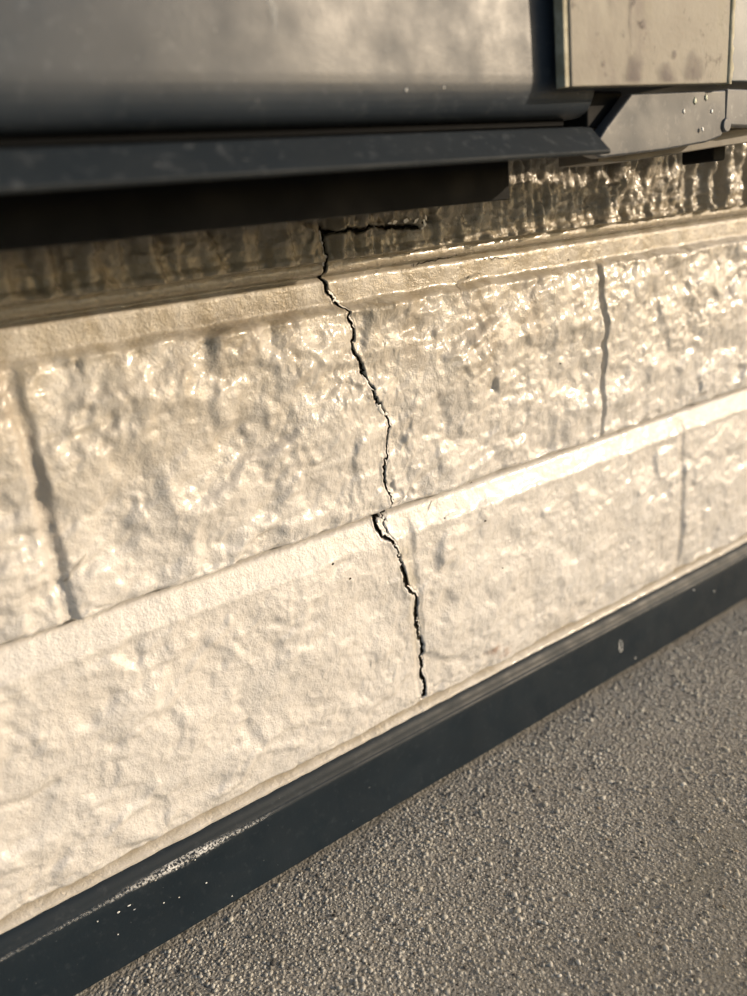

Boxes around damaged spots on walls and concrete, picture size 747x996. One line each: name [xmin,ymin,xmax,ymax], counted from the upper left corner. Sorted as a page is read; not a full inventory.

crack [318,215,428,696]